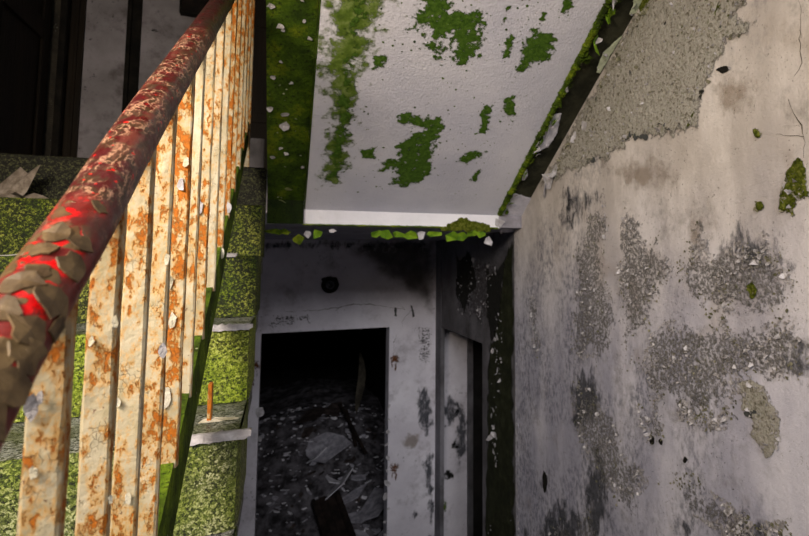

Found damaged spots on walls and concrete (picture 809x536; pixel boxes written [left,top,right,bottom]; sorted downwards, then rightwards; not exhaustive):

flaking render [540,0,757,197]
peeling [570,188,809,458]
water stain [418,388,433,436]
water stain [444,395,467,463]
water stain [540,446,609,536]
water stain [570,366,600,432]
peeling [571,381,660,515]
peeling [670,472,792,536]